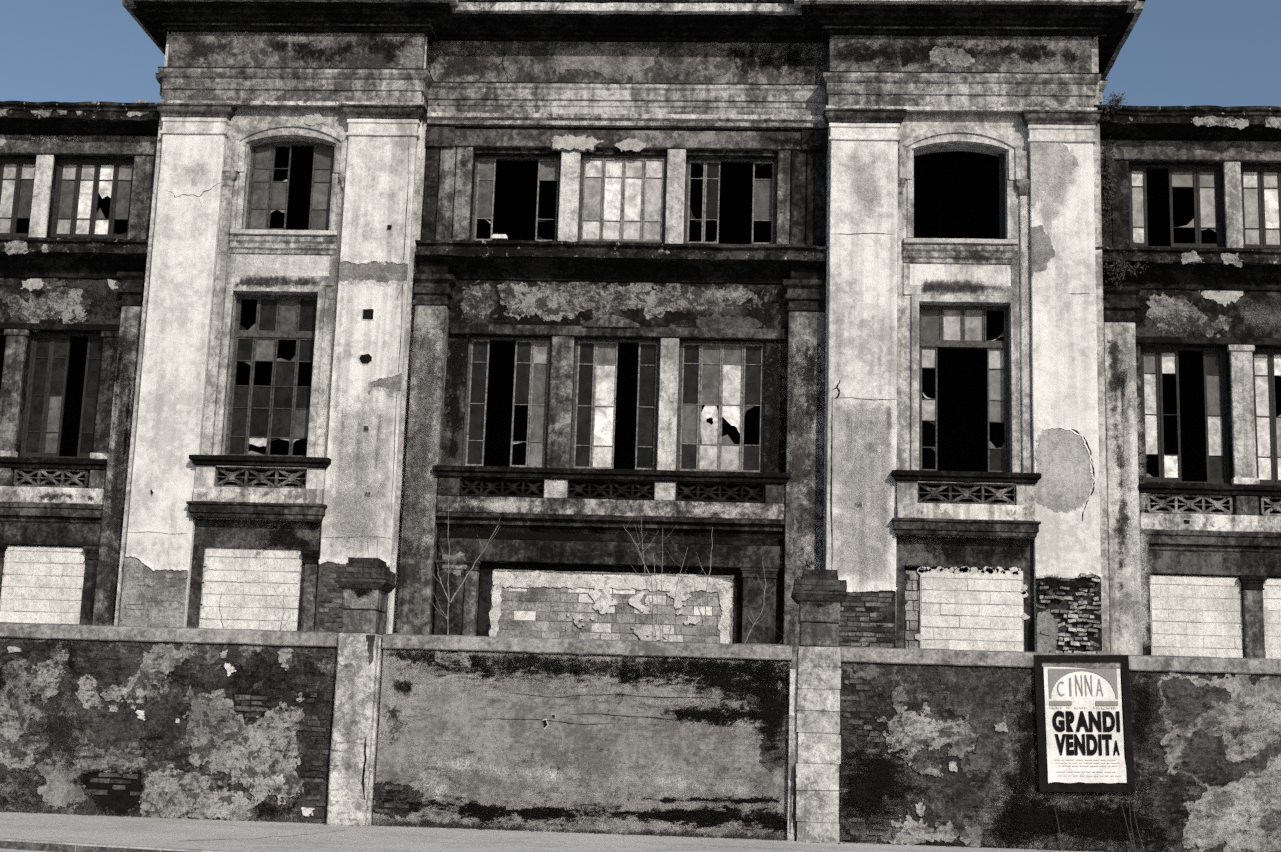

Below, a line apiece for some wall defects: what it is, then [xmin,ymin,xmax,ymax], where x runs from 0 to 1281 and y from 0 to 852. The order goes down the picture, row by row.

peeling [1193,115,1249,130]
peeling [1265,117,1281,129]
peeling [0,278,91,332]
peeling [460,280,763,329]
peeling [1146,290,1243,337]
spalling [1035,426,1095,513]
peeling [628,591,666,641]
flaking render [1035,570,1103,654]
flaking render [0,553,334,823]
leakage [387,650,792,686]
leakage [674,709,737,727]
flaking render [1138,673,1281,852]